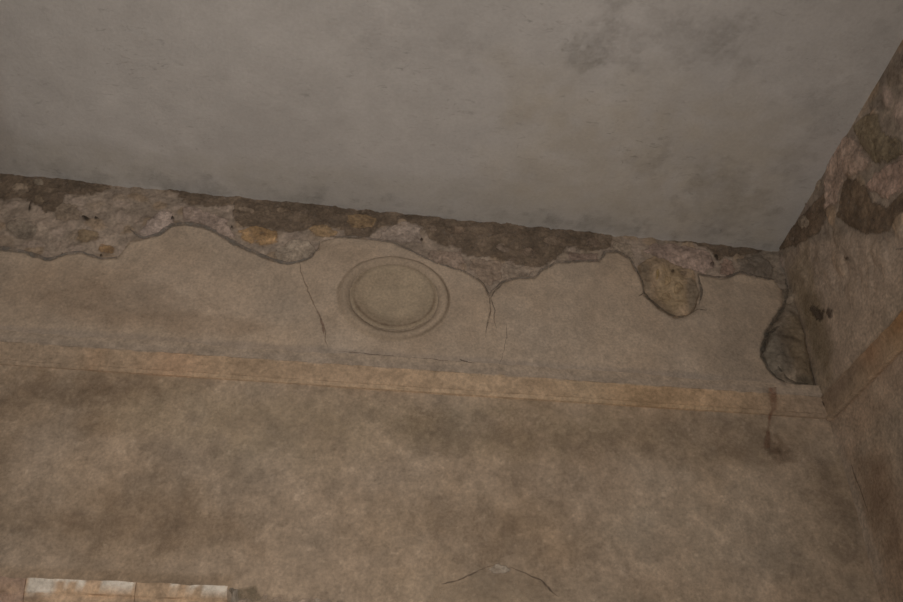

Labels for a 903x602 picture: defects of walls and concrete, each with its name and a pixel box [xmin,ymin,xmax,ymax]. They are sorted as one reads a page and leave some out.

crack [299,262,389,356]
flaking render [0,173,903,320]
crack [334,235,659,360]